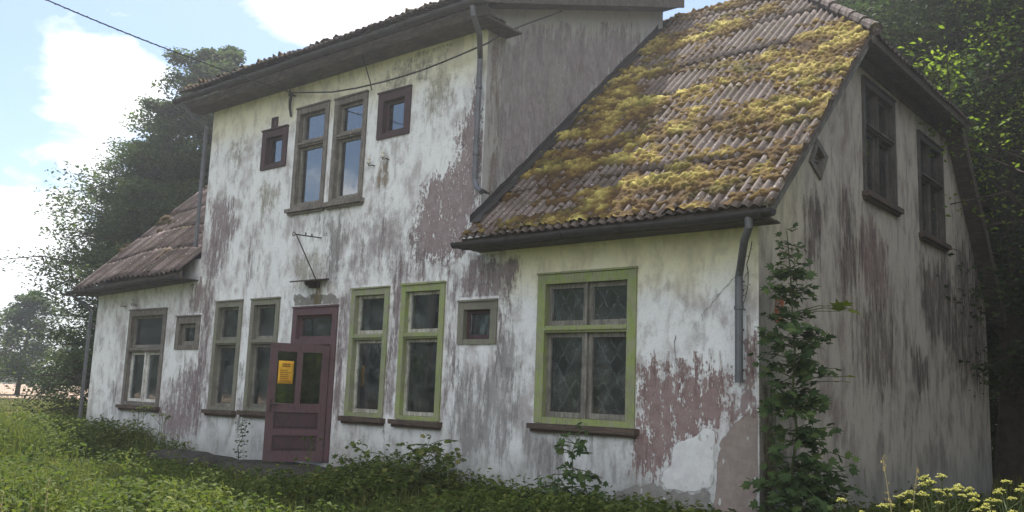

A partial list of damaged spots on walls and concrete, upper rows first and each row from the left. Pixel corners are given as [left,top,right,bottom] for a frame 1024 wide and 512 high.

peeling [407,90,484,279]
damp [489,23,640,193]
damp [804,189,893,379]
damp [911,235,986,388]
peeling [614,328,759,512]